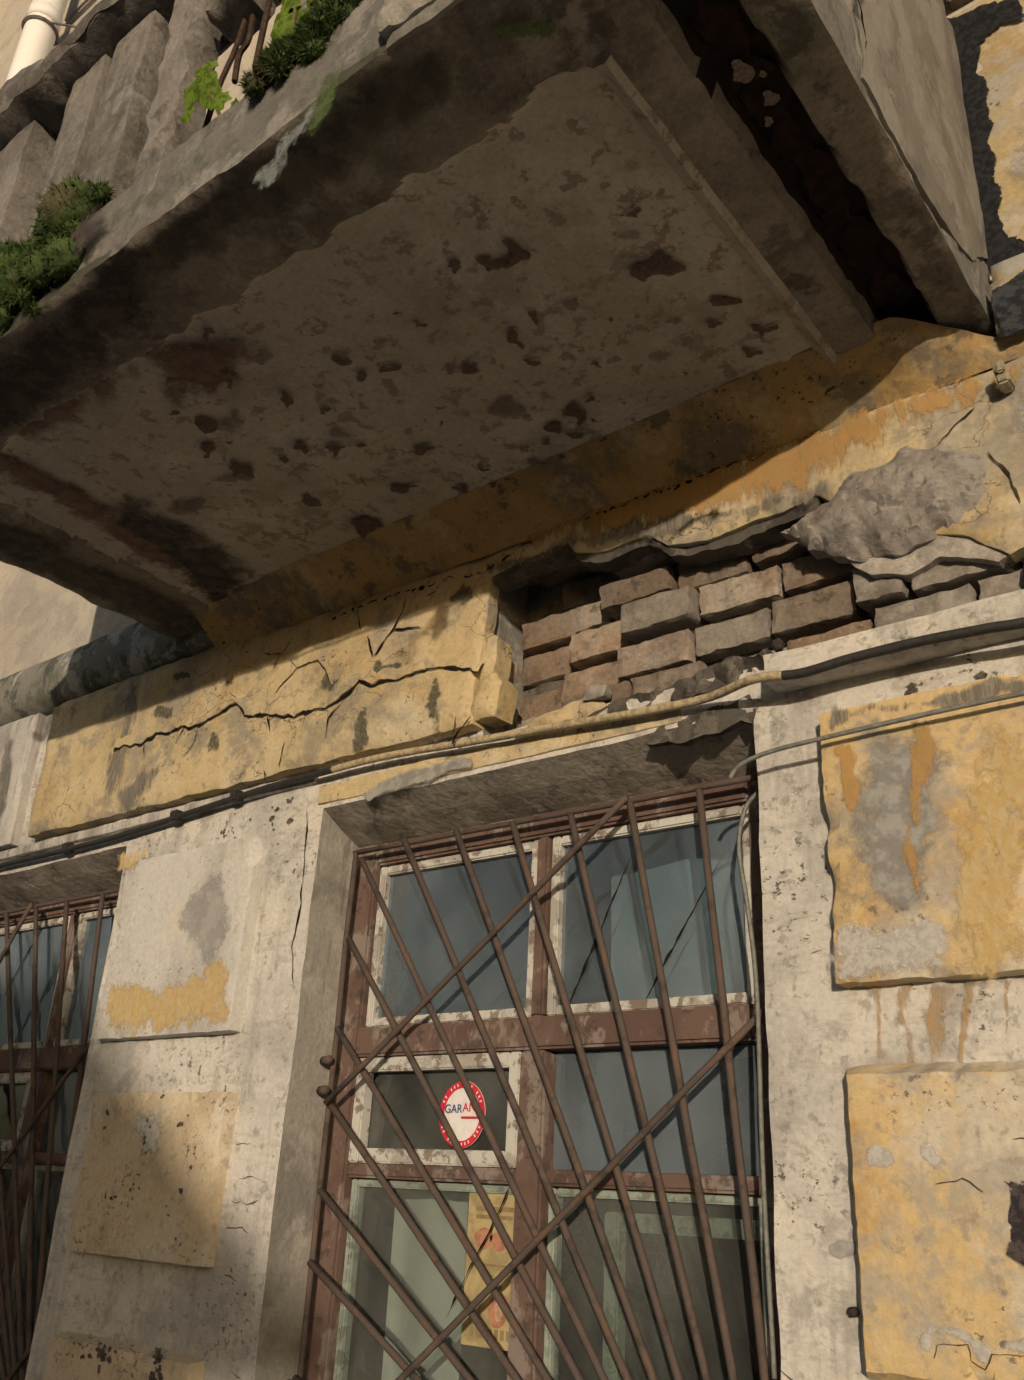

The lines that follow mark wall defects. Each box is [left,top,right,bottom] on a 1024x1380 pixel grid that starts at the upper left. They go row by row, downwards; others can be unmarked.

damp [0,54,451,440]
peeling [448,239,531,274]
peeling [630,251,687,282]
damp [0,453,246,602]
damp [487,480,826,573]
damp [0,527,201,639]
damp [450,584,473,605]
flaking render [494,496,1024,731]
crack [114,541,532,784]
flaking render [646,694,756,747]
peeling [1006,1181,1024,1266]
peeling [920,1324,1024,1370]